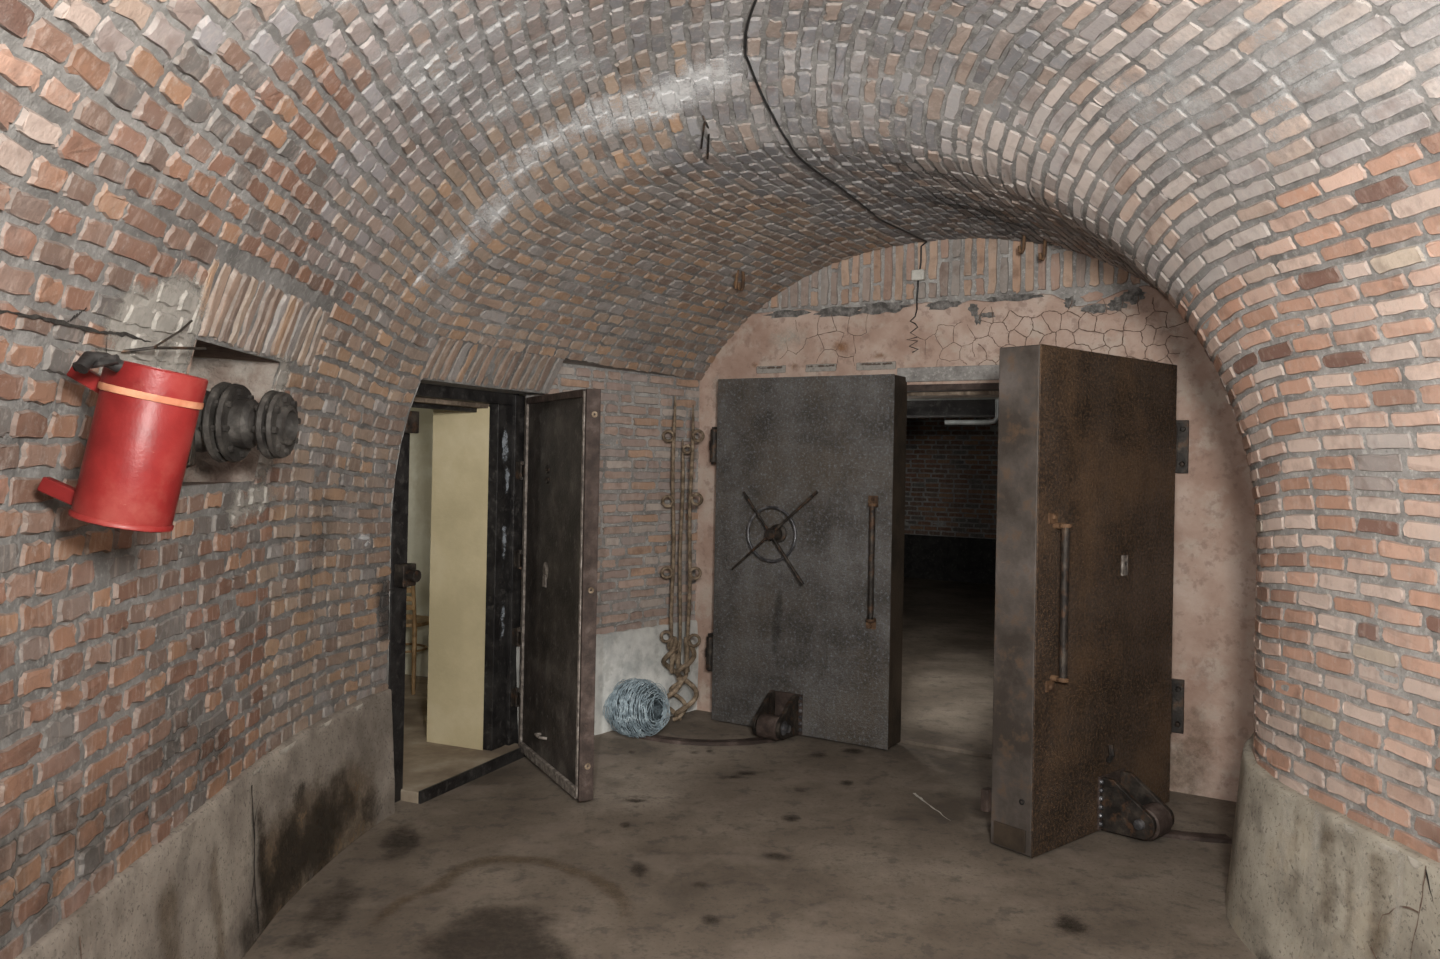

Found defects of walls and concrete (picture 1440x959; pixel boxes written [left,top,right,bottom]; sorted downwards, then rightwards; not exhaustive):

damp [244,769,374,950]
damp [426,910,562,959]
crack [1370,866,1433,959]